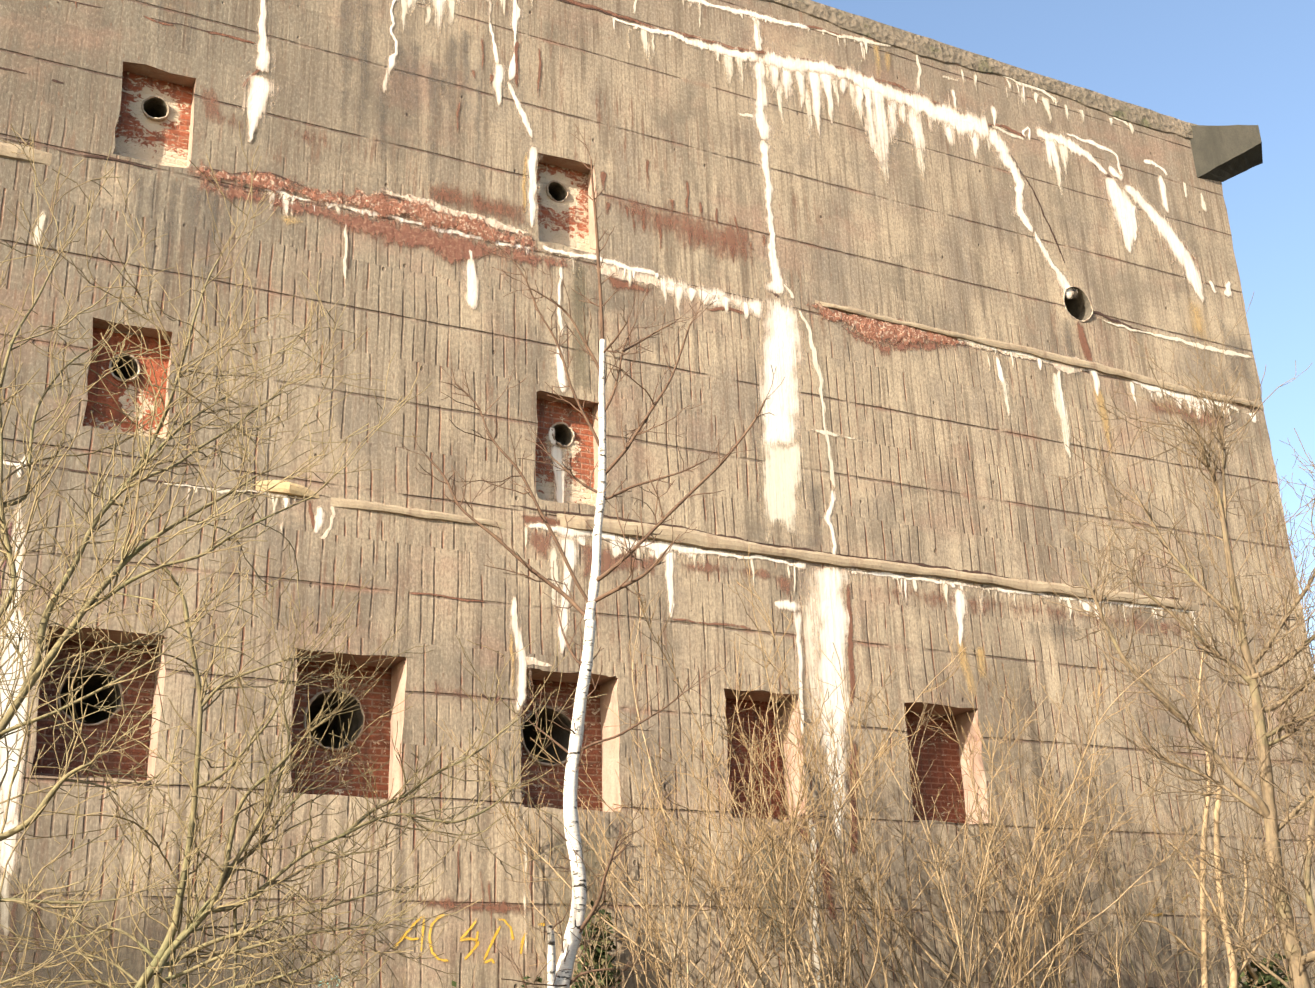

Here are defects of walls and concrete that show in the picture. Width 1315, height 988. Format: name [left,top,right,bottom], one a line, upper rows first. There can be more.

efflorescence [401,0,462,35]
efflorescence [234,0,278,142]
efflorescence [1003,76,1092,123]
spalling [188,164,544,257]
efflorescence [1143,159,1207,213]
spalling [807,303,967,356]
leakage [265,189,1196,838]
leakage [0,503,297,988]
leakage [806,819,821,988]